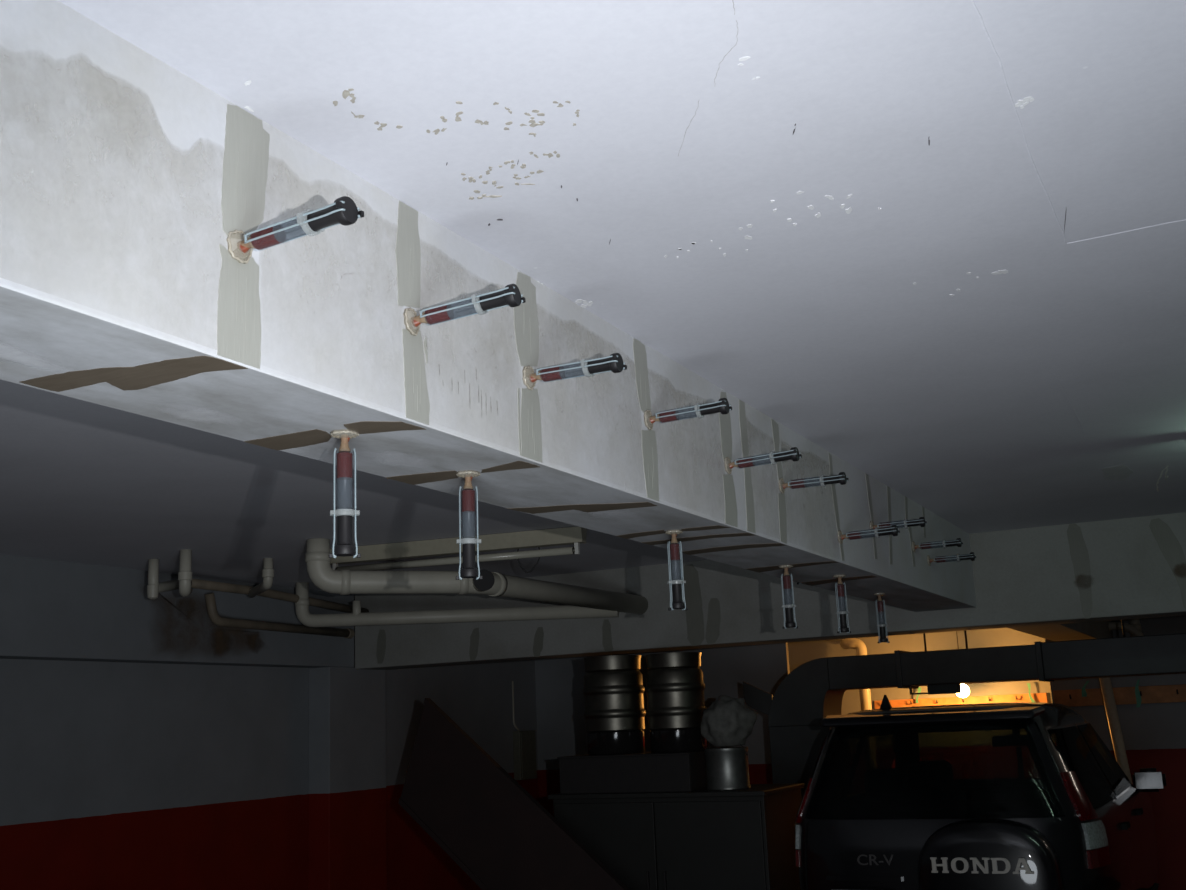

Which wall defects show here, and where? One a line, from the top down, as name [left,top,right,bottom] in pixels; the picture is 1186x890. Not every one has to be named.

peeling [426,101,489,135]
peeling [493,102,545,137]
peeling [461,151,560,200]